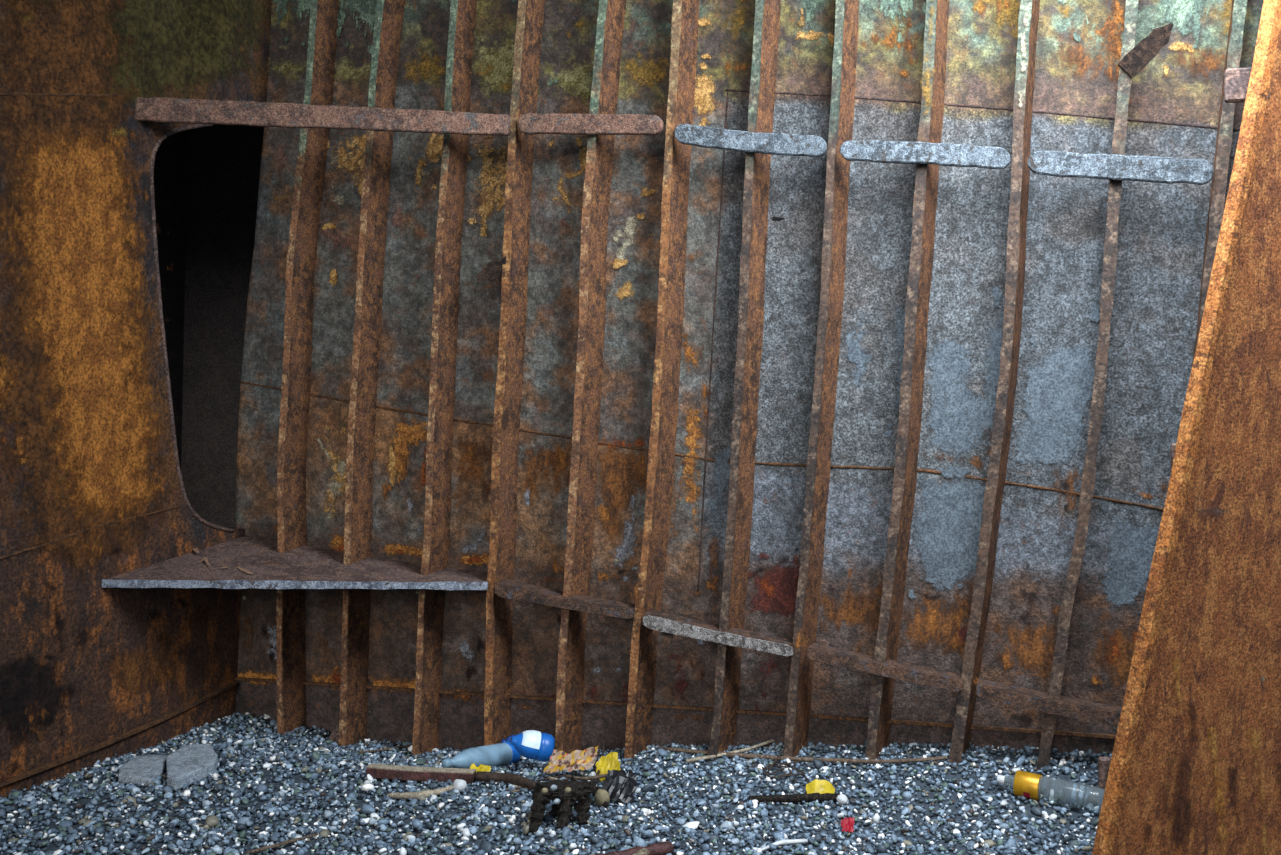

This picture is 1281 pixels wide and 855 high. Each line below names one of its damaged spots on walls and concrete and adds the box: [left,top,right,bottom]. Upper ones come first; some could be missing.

rust [1164,41,1224,76]
rust [327,134,366,205]
rust [409,133,443,189]
rust [467,135,507,237]
rust [0,0,167,578]
rust [317,424,346,518]
rust [382,418,428,499]
rust [596,438,647,538]
damp [0,583,88,773]
rust [748,548,800,616]
rust [904,585,973,657]
rust [1092,614,1138,686]